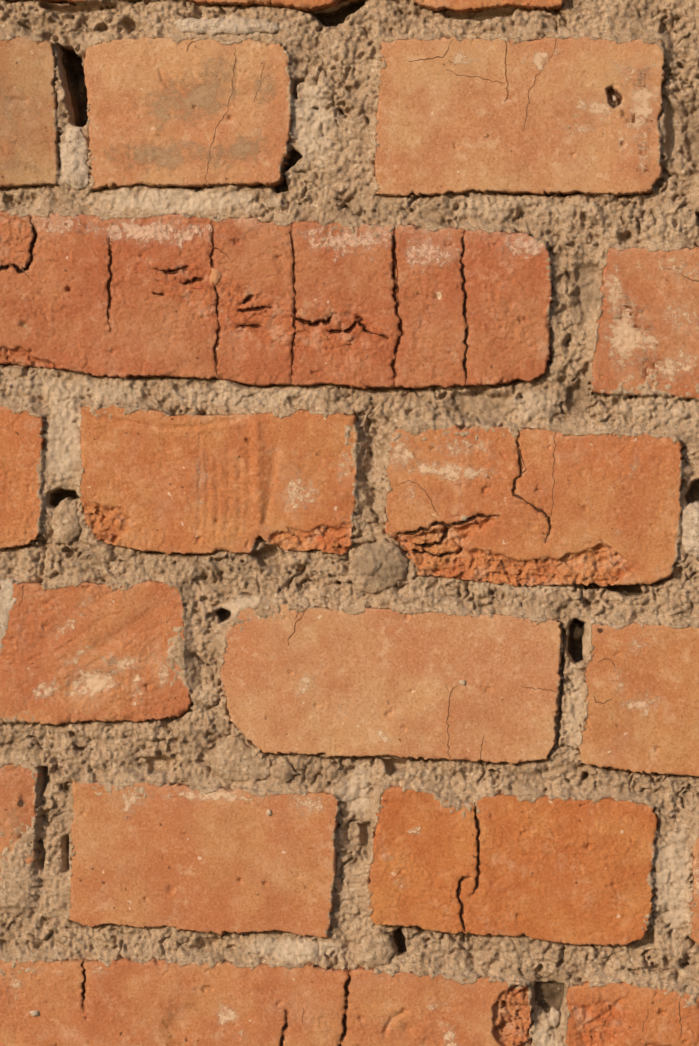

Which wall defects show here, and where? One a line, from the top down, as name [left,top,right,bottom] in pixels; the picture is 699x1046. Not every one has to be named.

spalling [0,216,33,265]
crack [105,240,113,330]
crack [289,223,297,383]
crack [391,226,403,386]
crack [460,230,468,386]
spalling [80,499,135,545]
spalling [269,524,354,555]
crack [390,427,556,561]
spalling [394,518,632,586]
crack [457,802,480,931]
crack [339,967,350,1046]
spalling [492,986,532,1046]